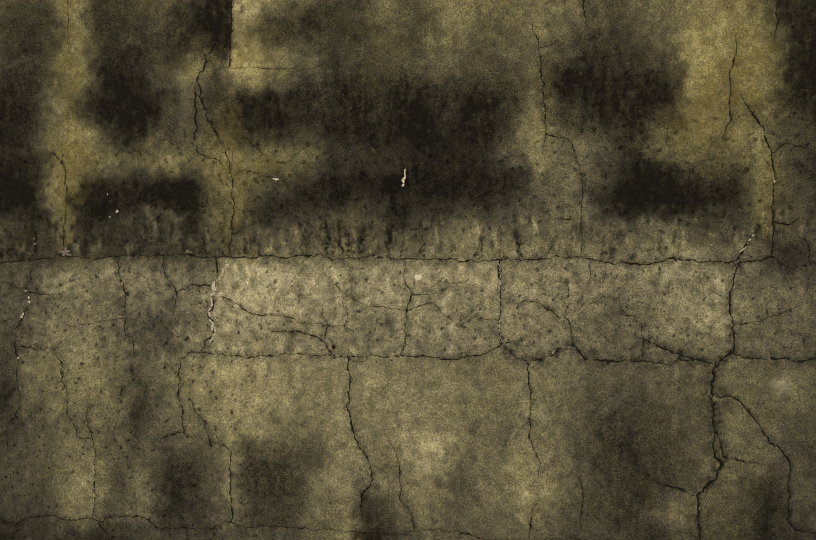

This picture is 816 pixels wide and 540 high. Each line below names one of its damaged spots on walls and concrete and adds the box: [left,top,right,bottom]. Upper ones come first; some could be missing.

damp [0,86,36,214]
damp [88,9,165,153]
damp [58,143,203,227]
crack [0,38,353,459]
damp [216,74,525,255]
crack [161,88,816,540]
crack [532,24,583,250]
damp [551,47,674,157]
damp [604,161,739,215]
crack [722,36,737,138]
crack [3,397,335,540]